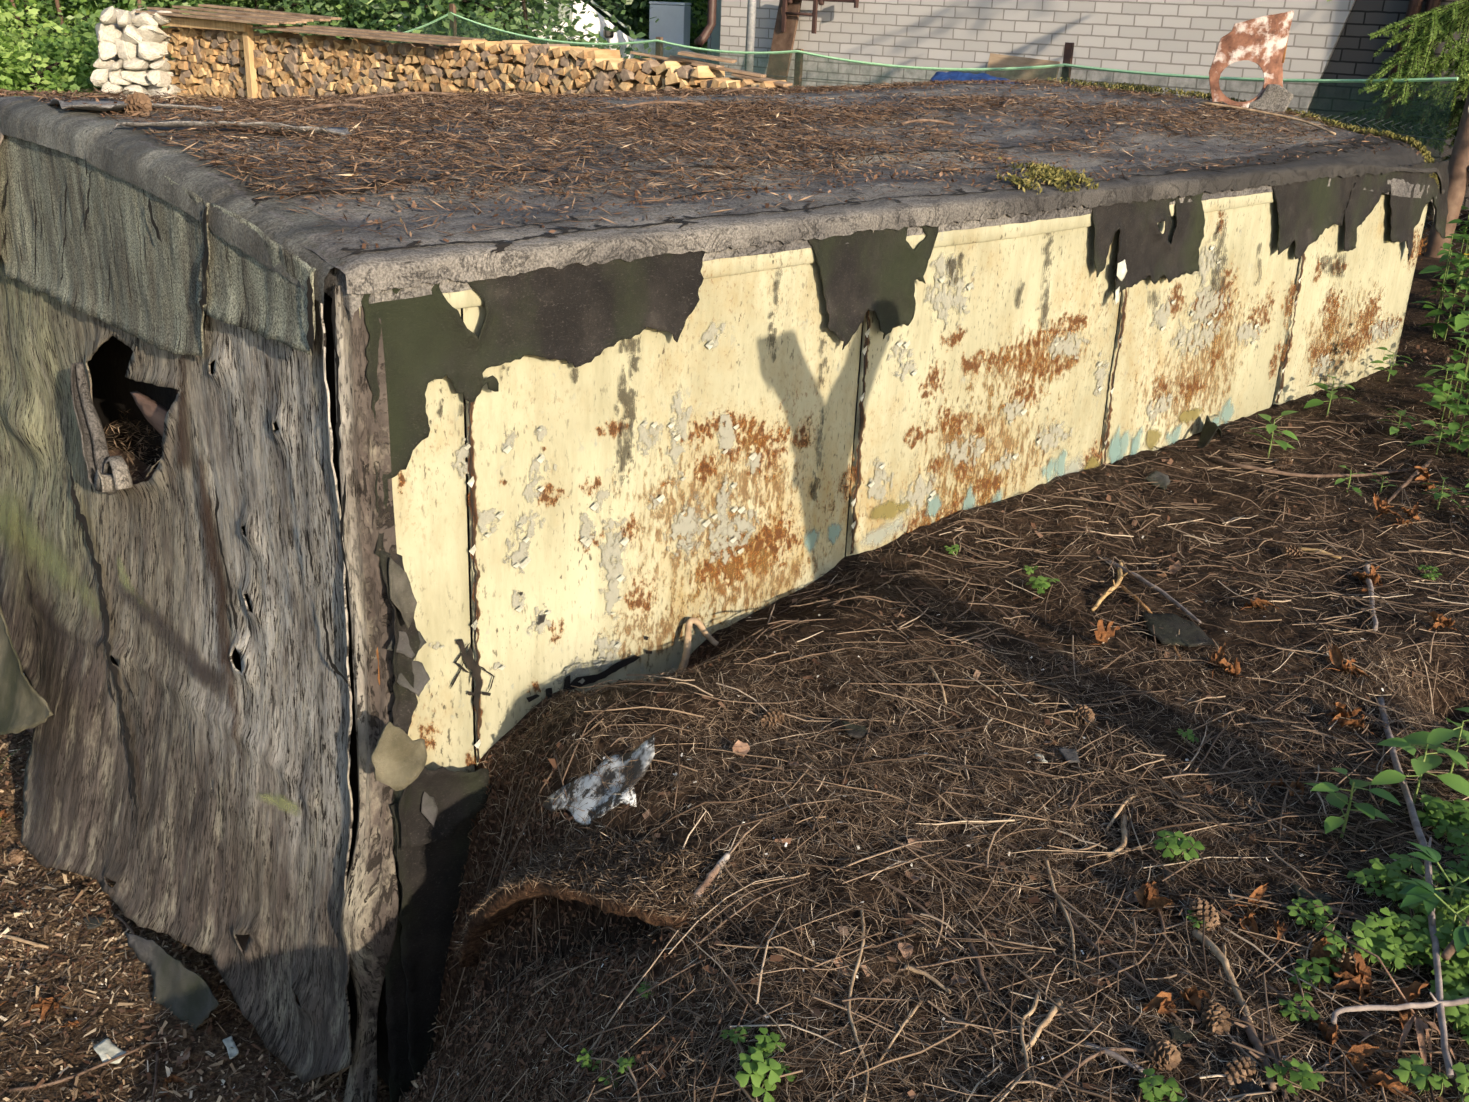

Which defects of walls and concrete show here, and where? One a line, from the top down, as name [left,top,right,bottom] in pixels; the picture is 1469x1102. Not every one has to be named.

rust [537,404,856,671]
rust [886,312,1103,539]
rust [1127,258,1402,442]